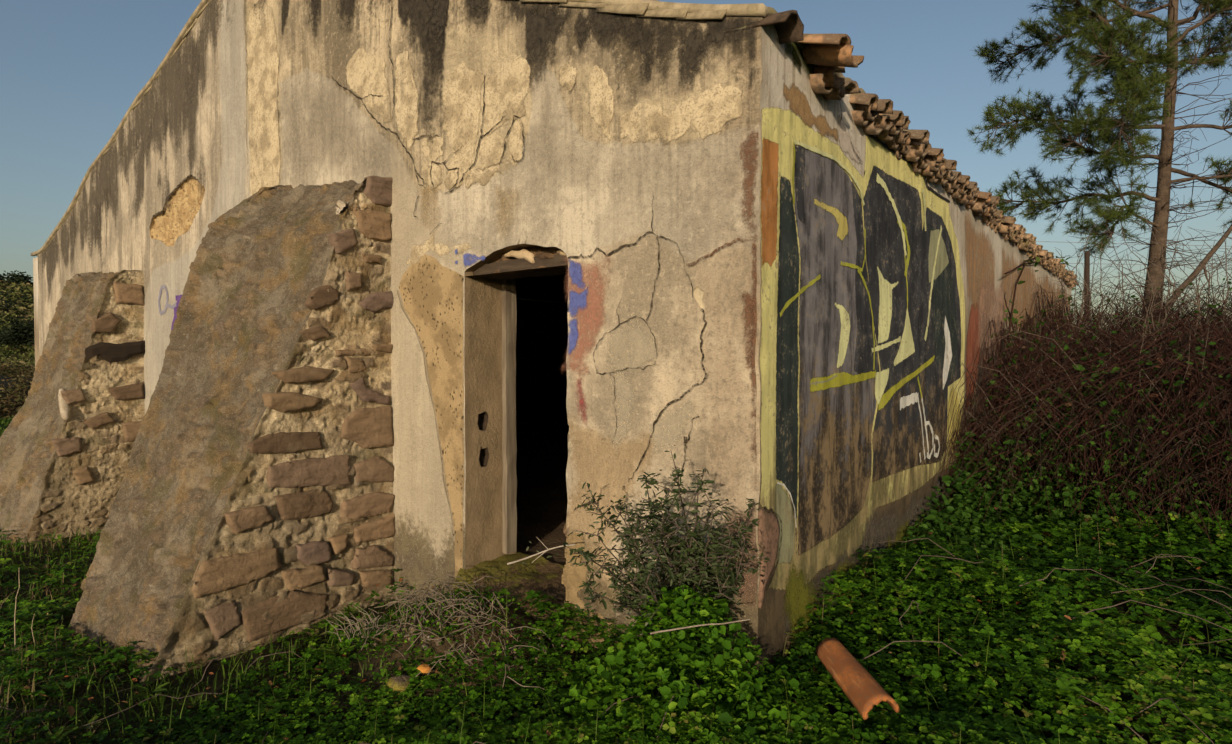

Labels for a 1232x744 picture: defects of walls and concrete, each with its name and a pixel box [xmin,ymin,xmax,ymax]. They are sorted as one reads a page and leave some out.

damp [42,0,228,293]
damp [281,0,289,34]
damp [306,0,321,36]
damp [337,0,355,30]
damp [398,0,448,140]
flaking render [345,44,531,190]
damp [466,0,488,20]
damp [506,0,756,89]
flaking render [559,63,743,146]
spalling [149,175,205,246]
crack [567,196,743,510]
peeling [397,231,570,578]